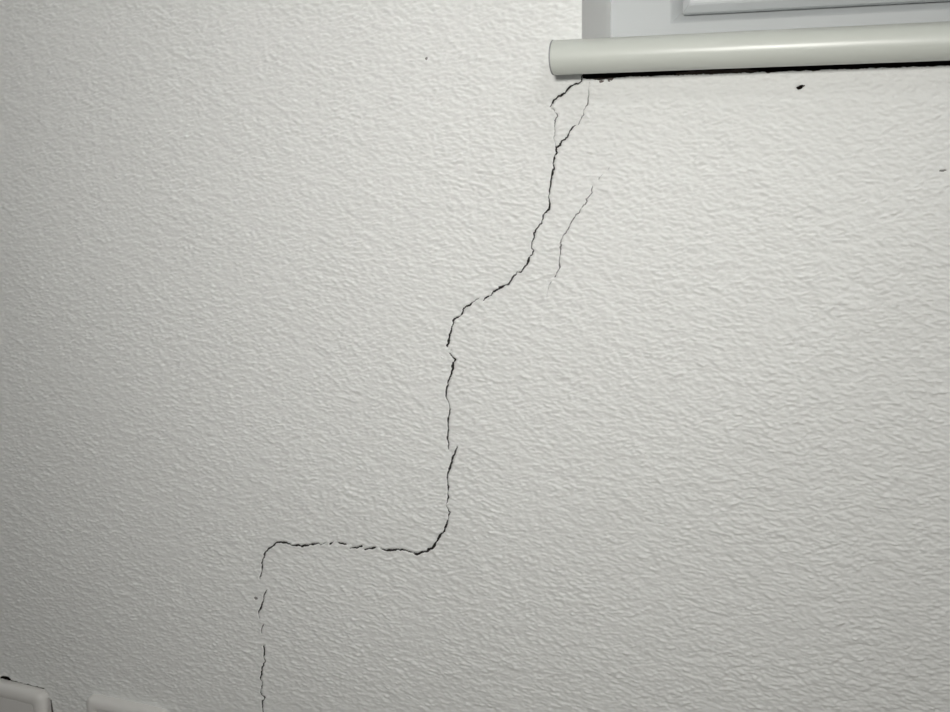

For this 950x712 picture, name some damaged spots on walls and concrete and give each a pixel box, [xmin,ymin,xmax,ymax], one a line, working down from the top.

crack [258,75,610,712]